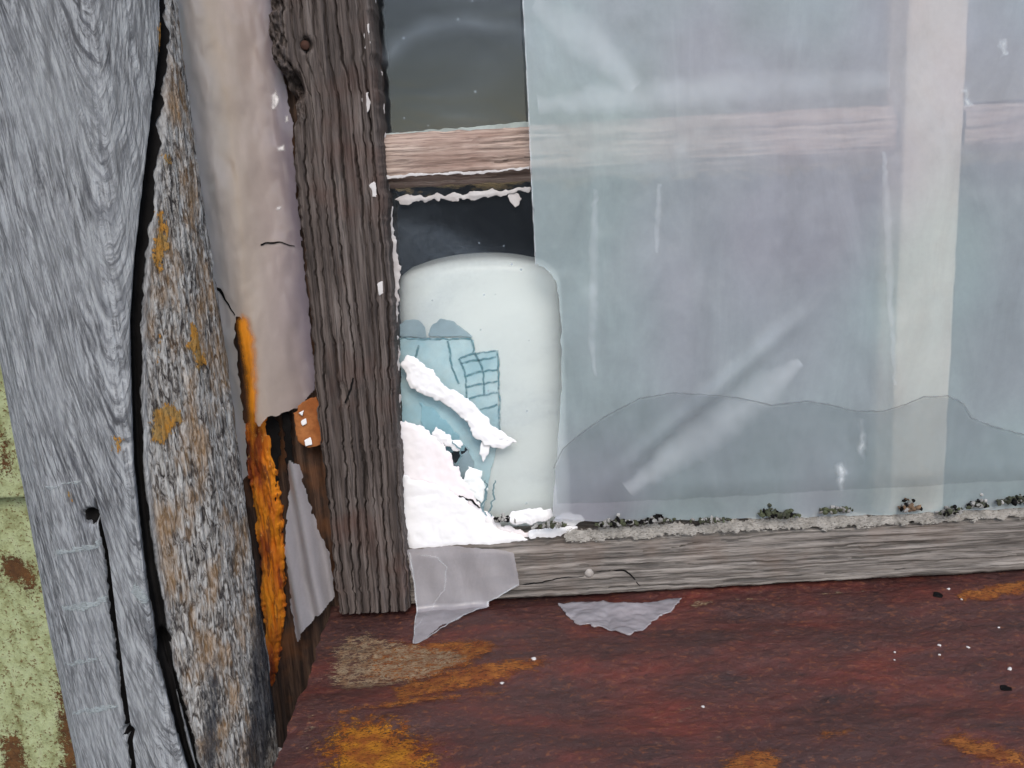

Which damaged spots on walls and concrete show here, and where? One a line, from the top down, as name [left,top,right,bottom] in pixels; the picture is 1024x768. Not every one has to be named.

peeling [369,166,531,321]
crack [131,0,201,768]
peeling [239,317,323,501]
crack [99,517,136,768]
corrosion [315,639,550,768]
crack [520,569,640,586]
corrosion [719,749,785,768]
corrosion [939,727,1024,768]
corrosion [955,580,1024,601]